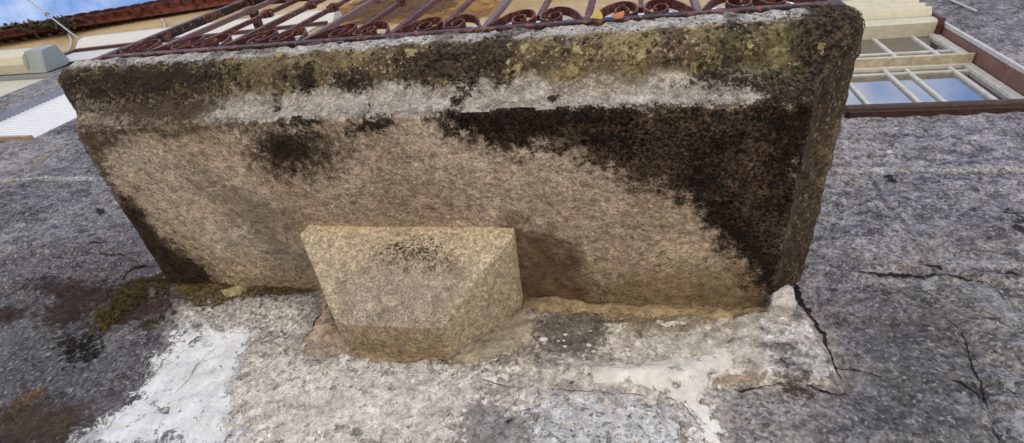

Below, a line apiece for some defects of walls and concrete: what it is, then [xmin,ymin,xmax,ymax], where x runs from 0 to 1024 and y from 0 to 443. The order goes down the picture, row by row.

leakage [57,57,374,285]
leakage [392,4,866,305]
leakage [373,232,469,292]
crack [858,263,1023,284]
crack [713,284,882,395]
crack [947,318,1001,443]